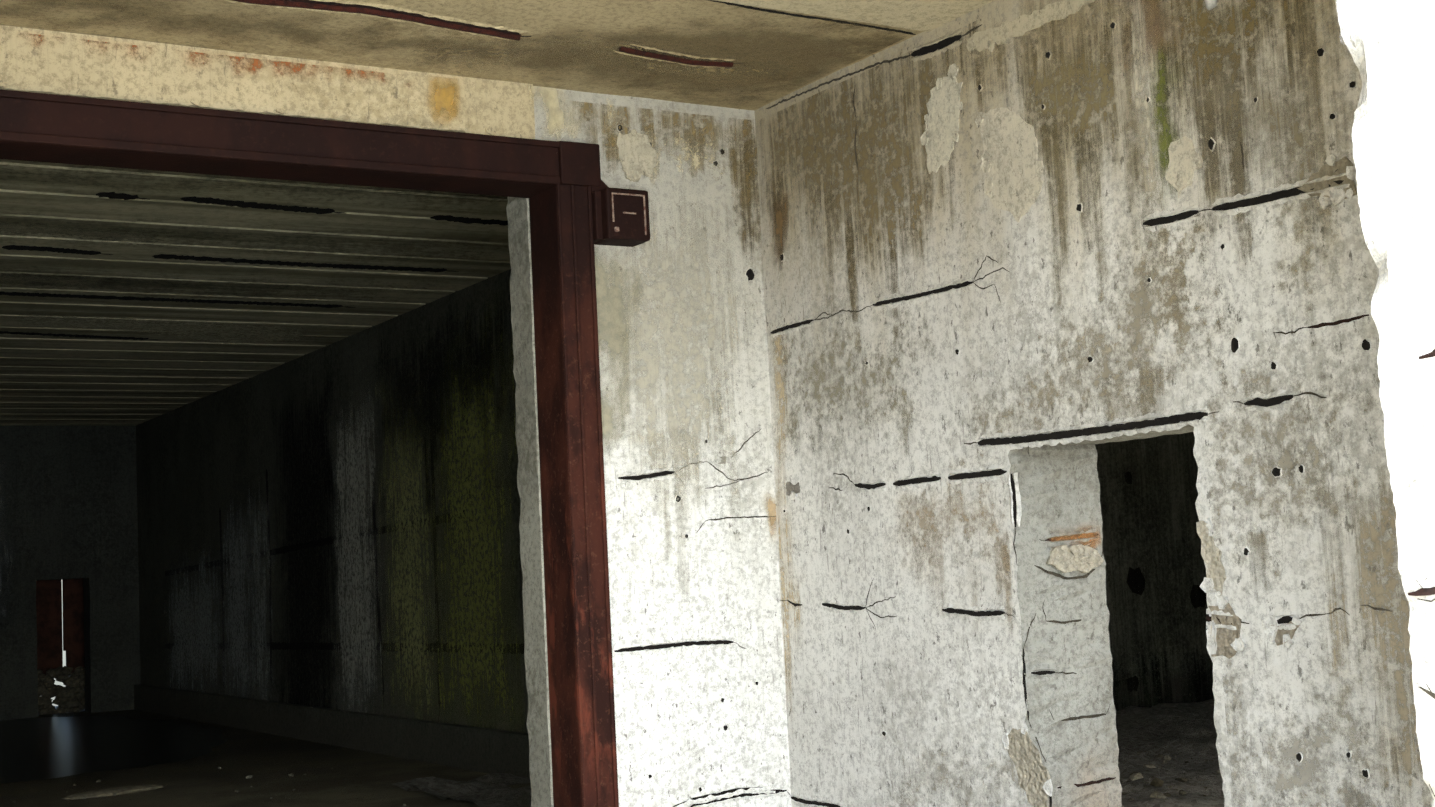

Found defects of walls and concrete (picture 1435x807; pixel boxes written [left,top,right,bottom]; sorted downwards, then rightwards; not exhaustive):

flaking render [966,0,1096,52]
damp [395,22,1002,269]
flaking render [920,63,1044,223]
damp [1018,0,1337,196]
crack [1143,142,1350,234]
crack [770,255,1009,338]
damp [973,228,1221,435]
crack [618,429,776,533]
spalling [1002,727,1053,807]